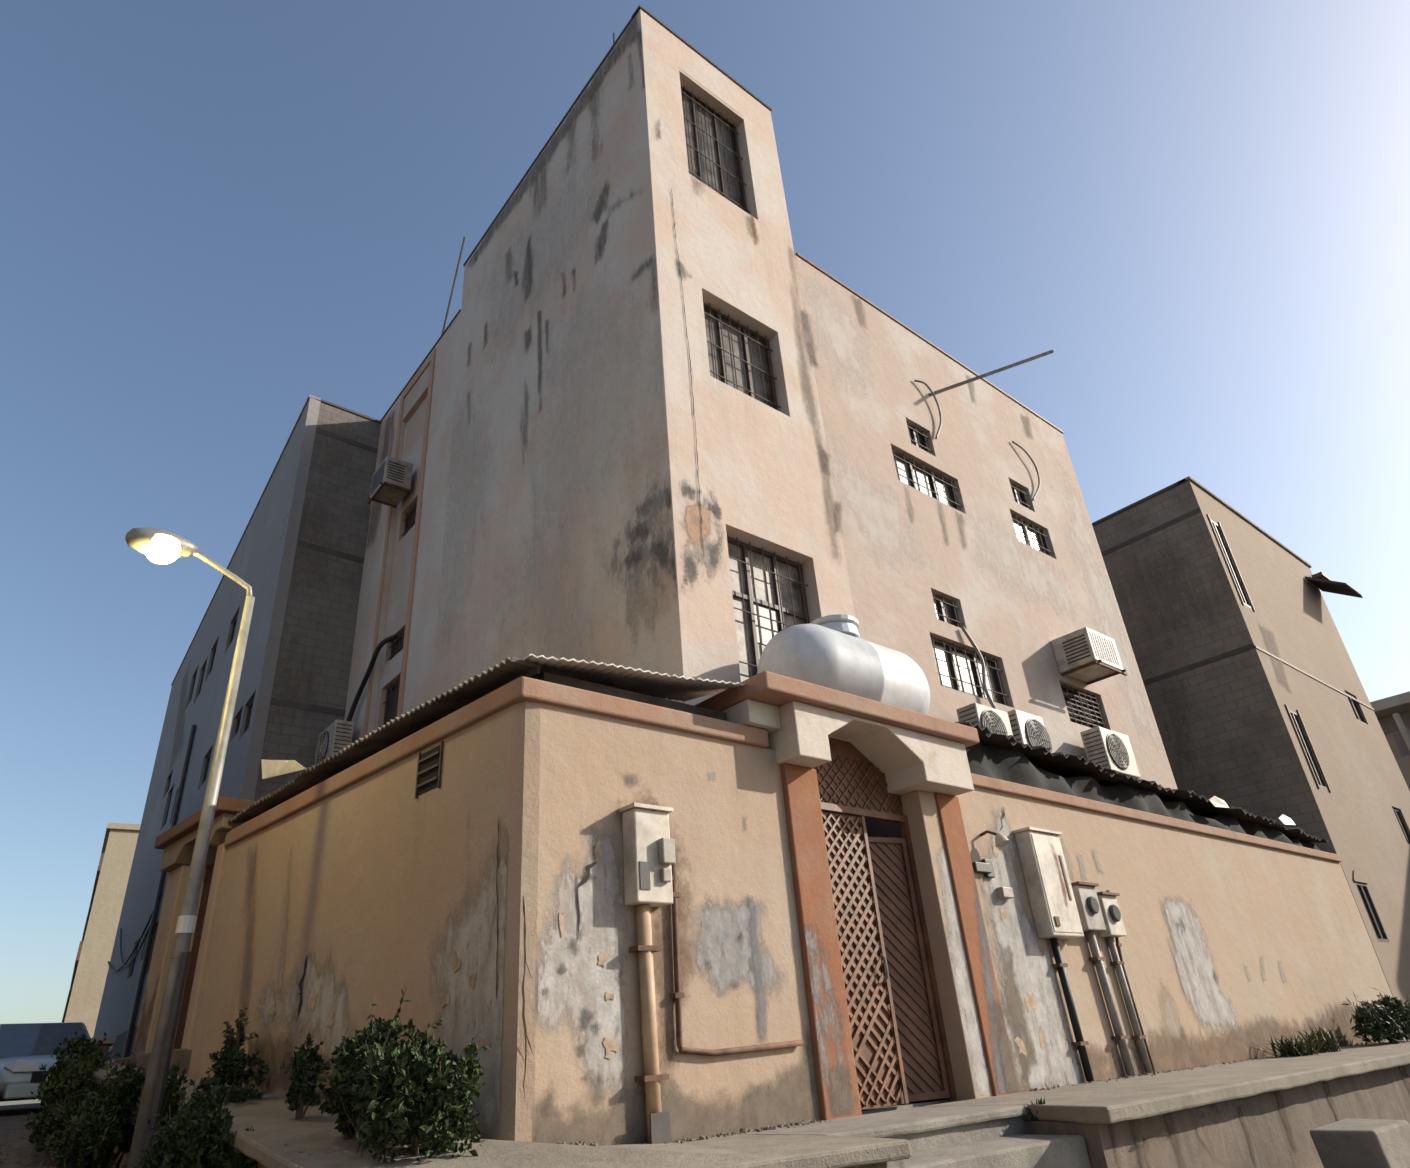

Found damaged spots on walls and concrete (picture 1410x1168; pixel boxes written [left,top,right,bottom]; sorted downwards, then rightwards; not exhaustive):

leakage [507,239,531,298]
leakage [593,186,608,264]
leakage [525,311,548,419]
leakage [611,484,721,587]
crack [298,956,307,1014]
peeling [431,840,508,1133]
peeling [538,830,626,1090]
crack [576,861,597,940]
peeling [697,897,779,1037]
peeling [981,814,1081,1090]
peeling [1162,899,1236,1041]